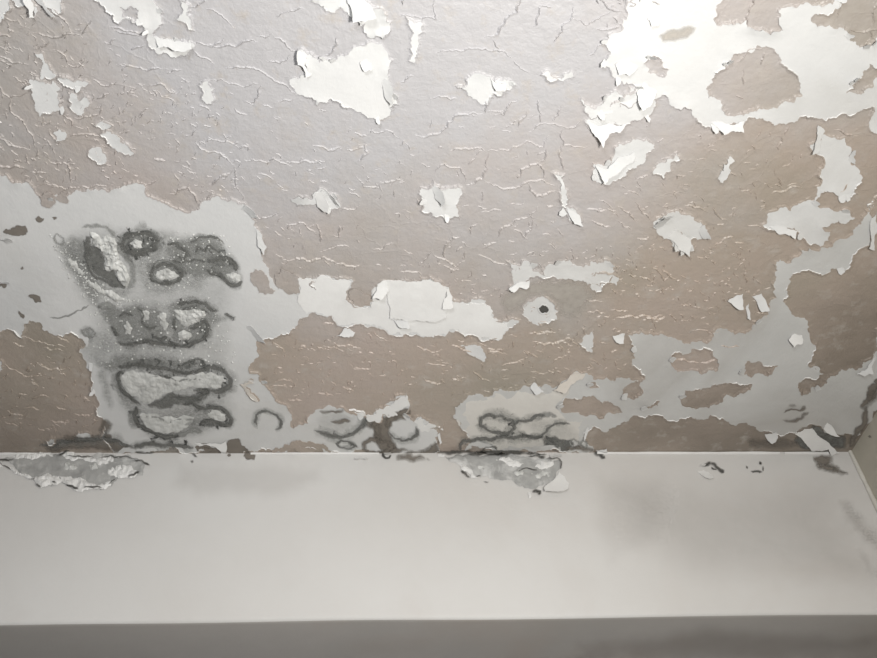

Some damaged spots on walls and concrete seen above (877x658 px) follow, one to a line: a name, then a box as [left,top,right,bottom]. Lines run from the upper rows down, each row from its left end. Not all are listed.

peeling [0,0,877,499]
water stain [45,224,255,460]
water stain [318,409,439,461]
water stain [460,412,594,452]
water stain [750,379,877,474]